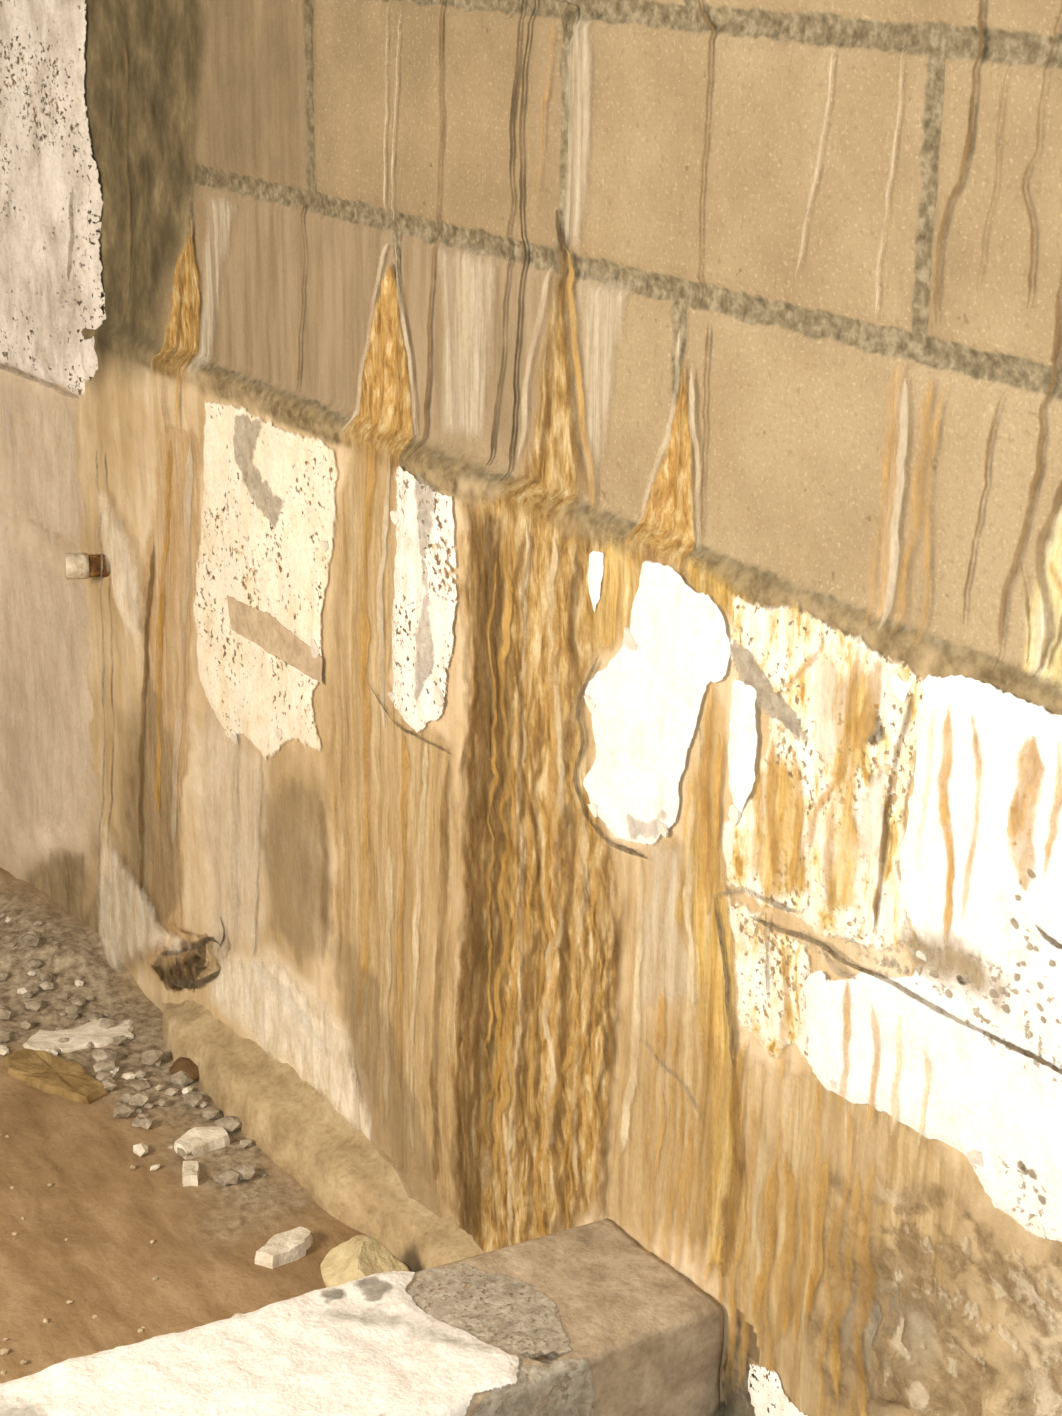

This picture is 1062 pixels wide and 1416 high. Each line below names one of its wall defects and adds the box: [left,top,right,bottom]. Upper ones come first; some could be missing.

spalling [0,0,106,397]
corrosion [138,220,200,967]
peeling [193,402,337,760]
peeling [388,466,457,733]
leakage [999,291,1062,683]
corrosion [328,210,962,1416]
peeling [583,551,1062,1416]
crack [714,890,950,1064]
crack [982,1030,1062,1074]
crack [1035,924,1062,949]